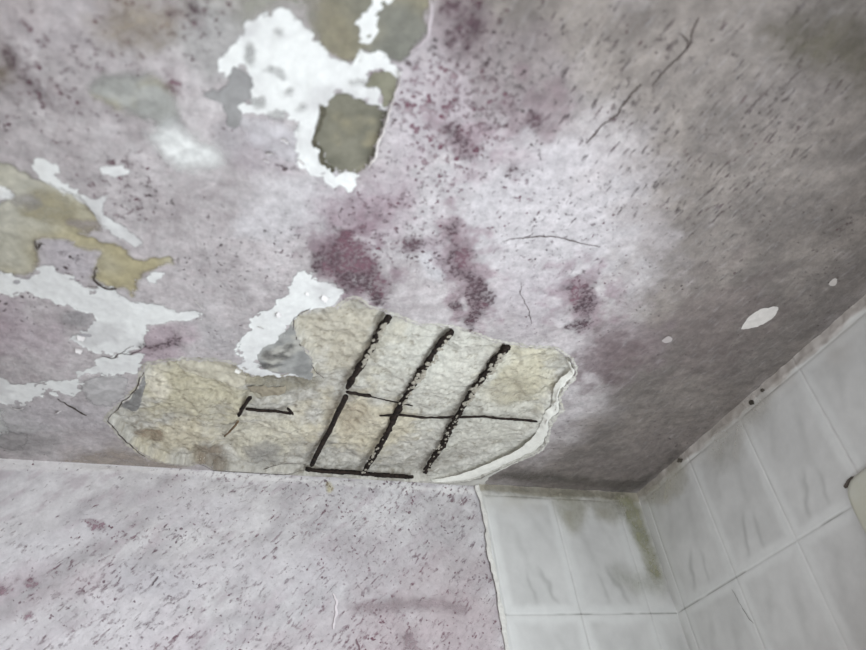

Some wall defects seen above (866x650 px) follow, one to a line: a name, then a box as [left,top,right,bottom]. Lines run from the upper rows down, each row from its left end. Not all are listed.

peeling [150,121,222,168]
peeling [204,0,433,193]
crack [586,18,699,143]
spalling [0,158,578,486]
peeling [741,306,778,329]
leakage [616,497,660,577]